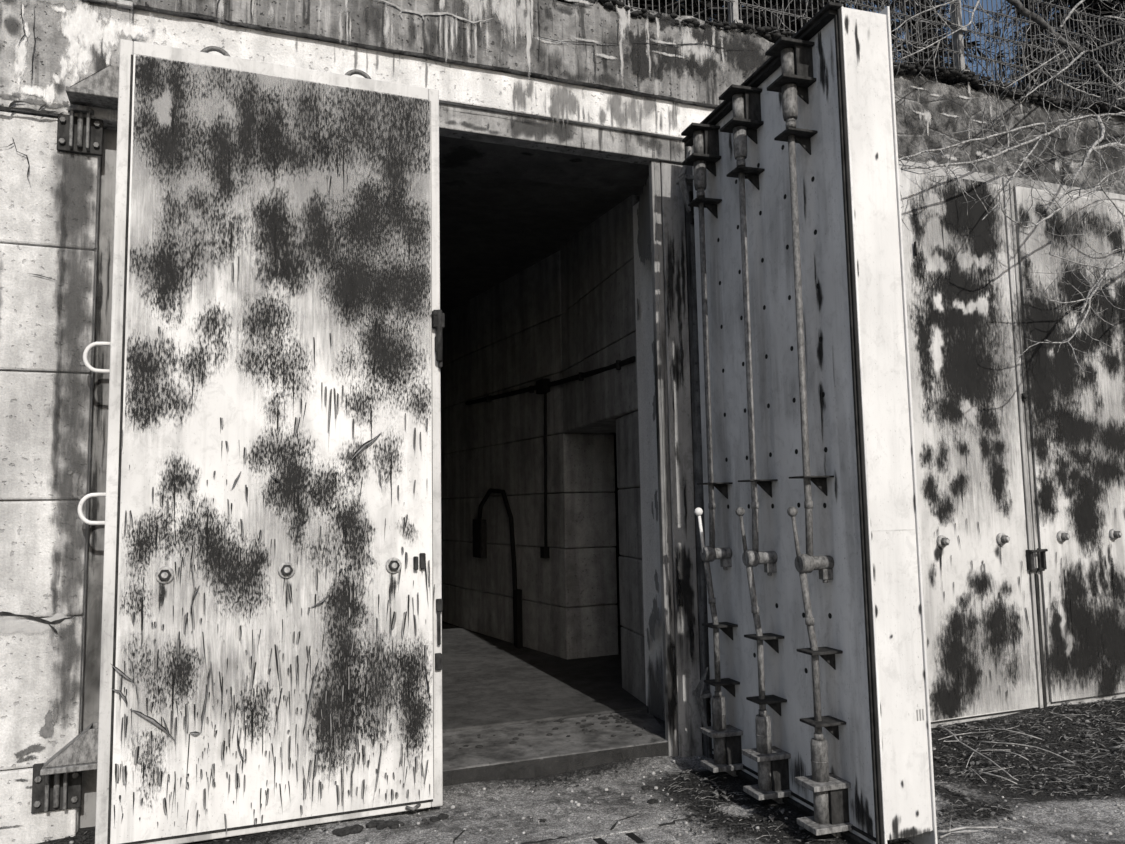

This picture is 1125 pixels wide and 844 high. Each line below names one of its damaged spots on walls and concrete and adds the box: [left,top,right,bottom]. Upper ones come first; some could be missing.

leakage [339,0,379,68]
leakage [366,0,395,70]
leakage [411,0,773,153]
leakage [52,152,94,721]
crack [0,611,76,634]